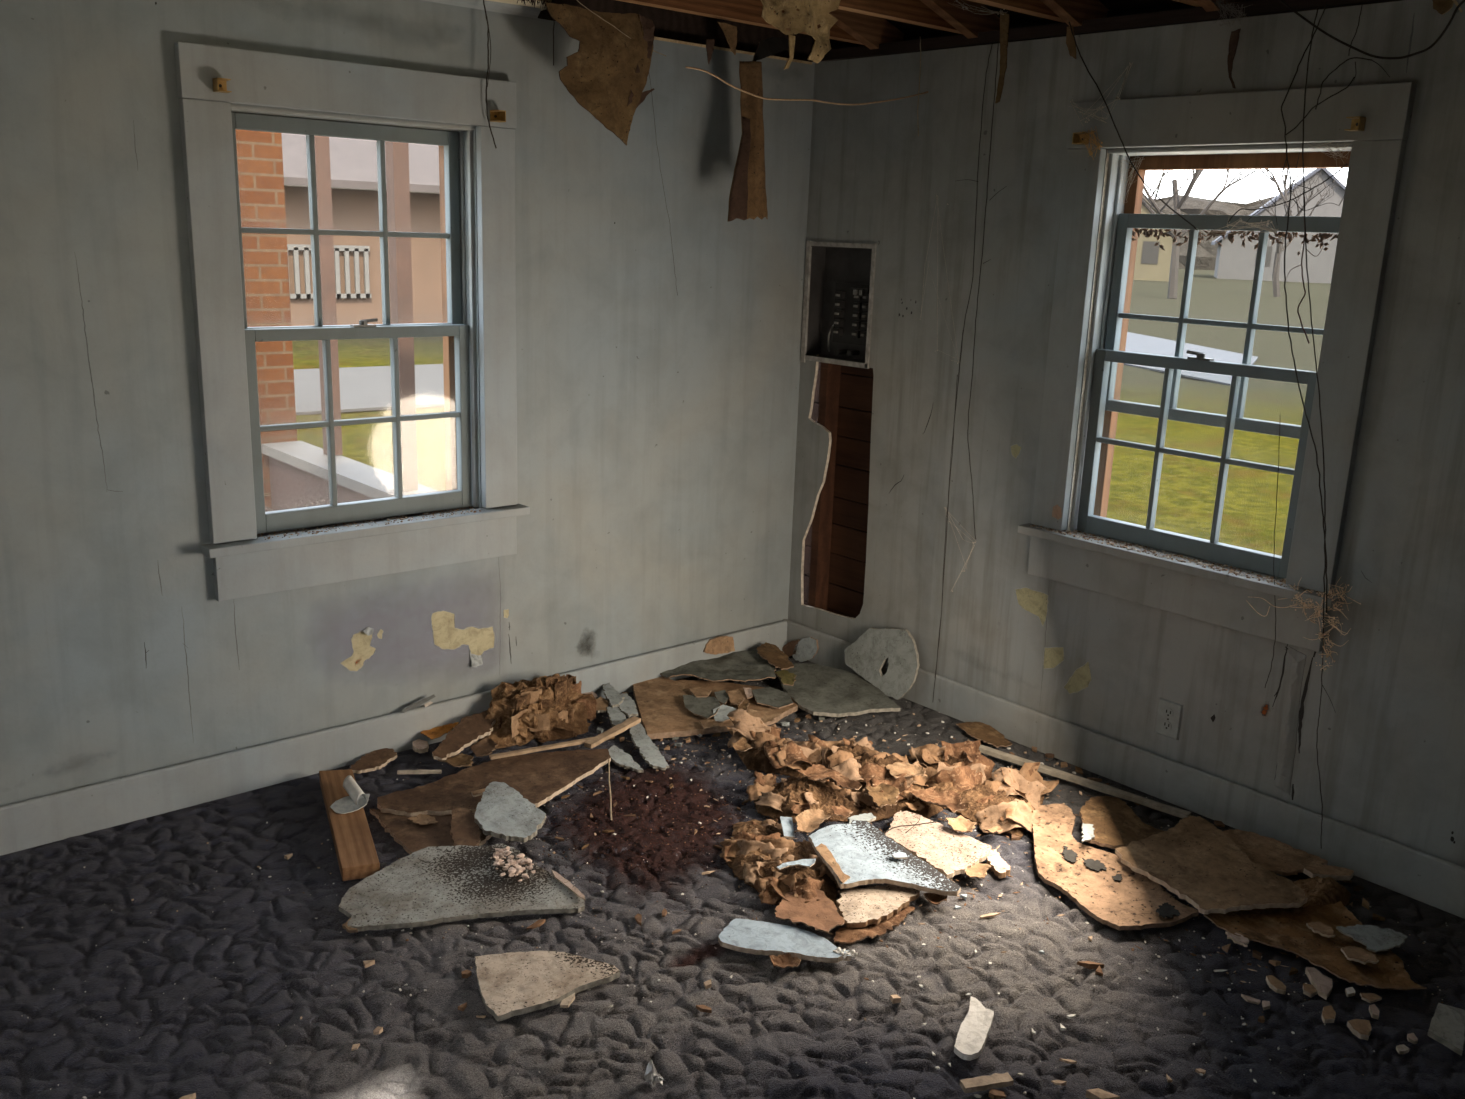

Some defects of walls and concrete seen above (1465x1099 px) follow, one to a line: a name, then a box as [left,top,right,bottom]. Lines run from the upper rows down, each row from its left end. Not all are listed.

peeling [340,627,384,672]
peeling [431,609,509,668]